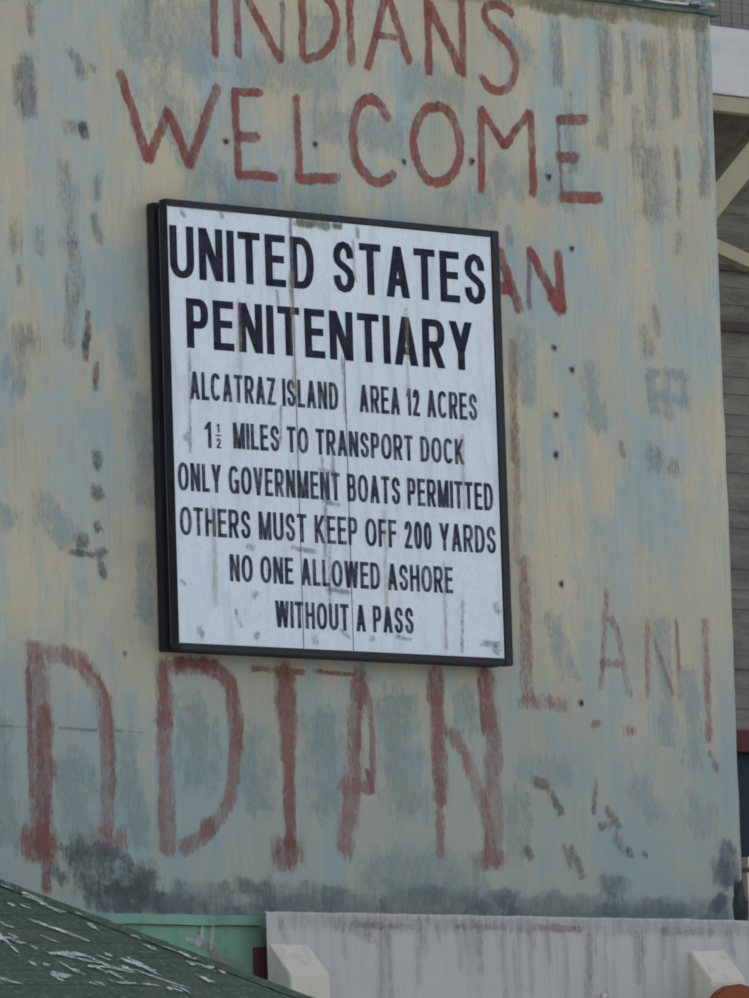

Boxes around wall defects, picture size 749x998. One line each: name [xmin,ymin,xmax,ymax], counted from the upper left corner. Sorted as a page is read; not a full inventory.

water stain [52,841,344,948]
water stain [413,840,740,920]